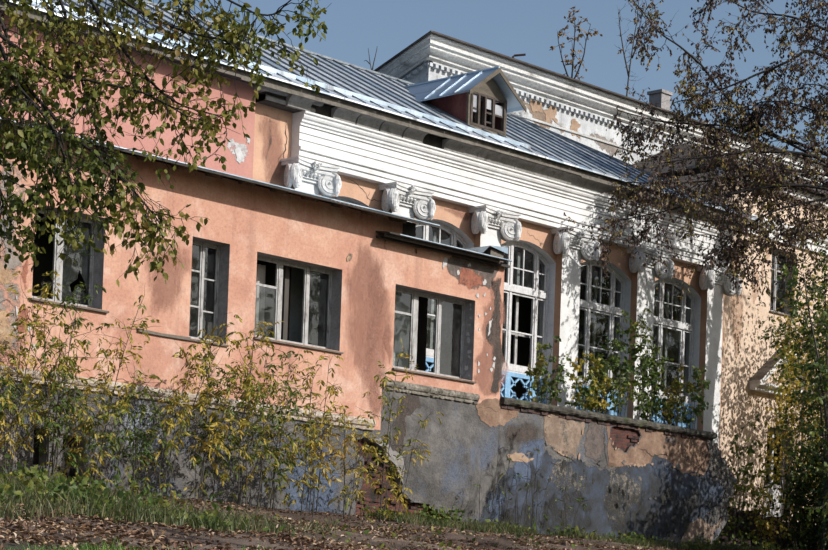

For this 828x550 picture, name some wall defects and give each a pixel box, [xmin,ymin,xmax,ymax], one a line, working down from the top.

peeling [227,138,250,164]
peeling [523,99,581,138]
peeling [590,134,622,156]
flaking render [0,159,37,353]
flaking render [442,250,499,376]
water stain [475,278,508,394]
flaking render [475,398,518,427]
flaking render [507,413,594,496]
flaking render [604,424,732,520]
flaking render [681,517,722,547]